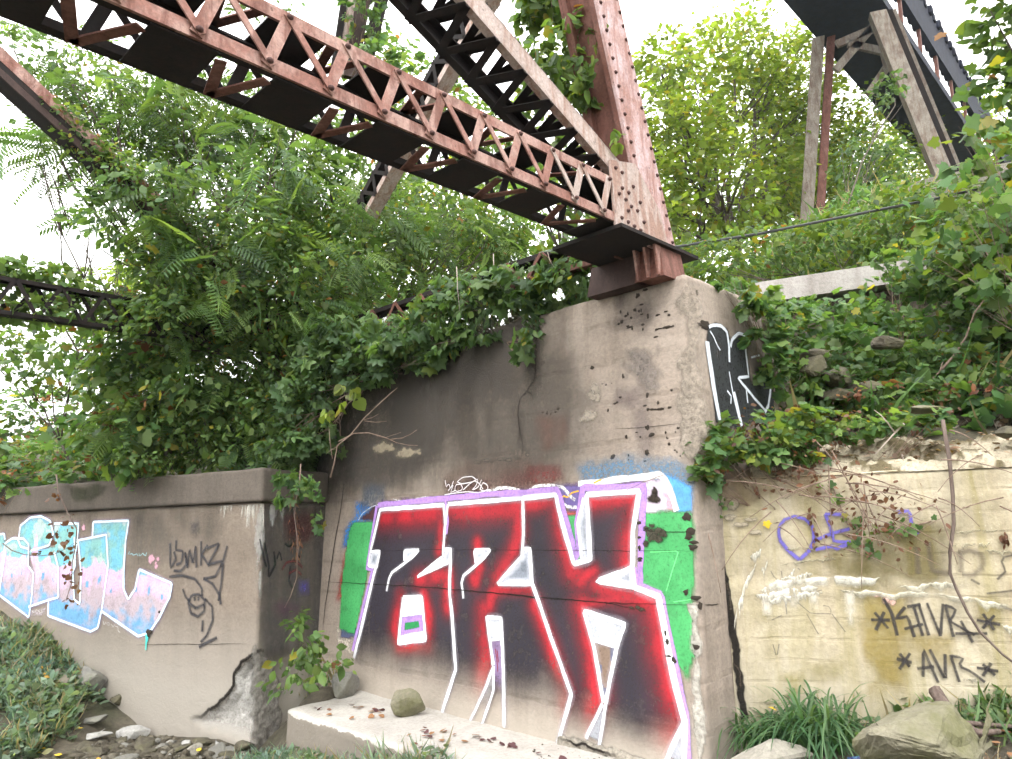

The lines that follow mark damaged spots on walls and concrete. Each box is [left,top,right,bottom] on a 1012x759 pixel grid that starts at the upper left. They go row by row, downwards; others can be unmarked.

crack [518,346,537,446]
leakage [734,525,1001,627]
crack [706,567,749,719]
spalling [202,645,282,749]